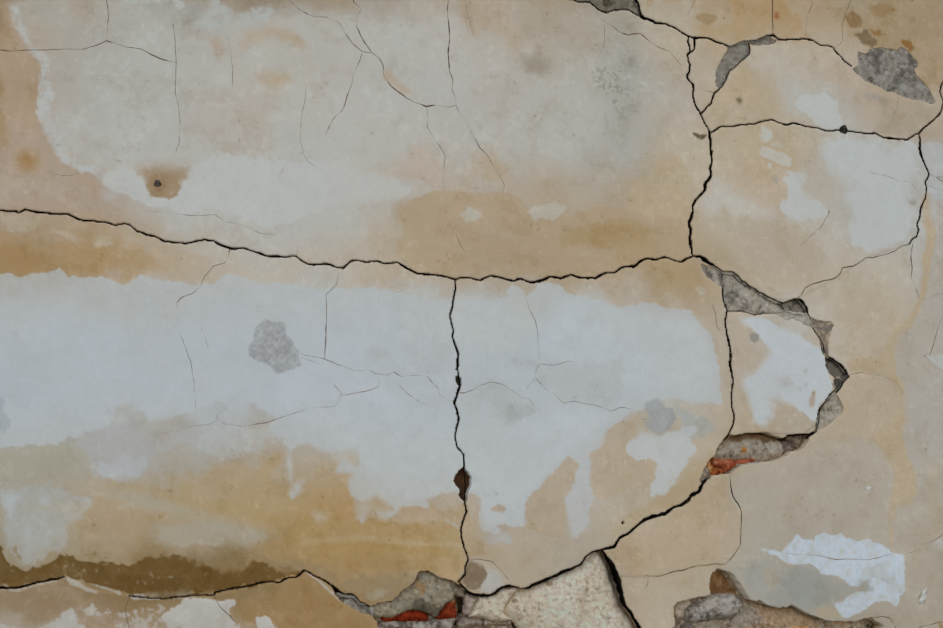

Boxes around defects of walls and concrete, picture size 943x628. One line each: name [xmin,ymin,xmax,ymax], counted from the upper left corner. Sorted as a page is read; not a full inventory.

spalling [573,0,639,16]
spalling [715,36,780,90]
spalling [853,48,935,104]
crack [0,0,943,320]
crack [712,289,764,437]
peeling [699,264,847,482]
crack [786,328,889,439]
crack [439,284,710,628]
leakage [0,476,479,606]
crack [211,570,379,623]
spalling [306,558,506,628]
peeling [676,531,906,628]